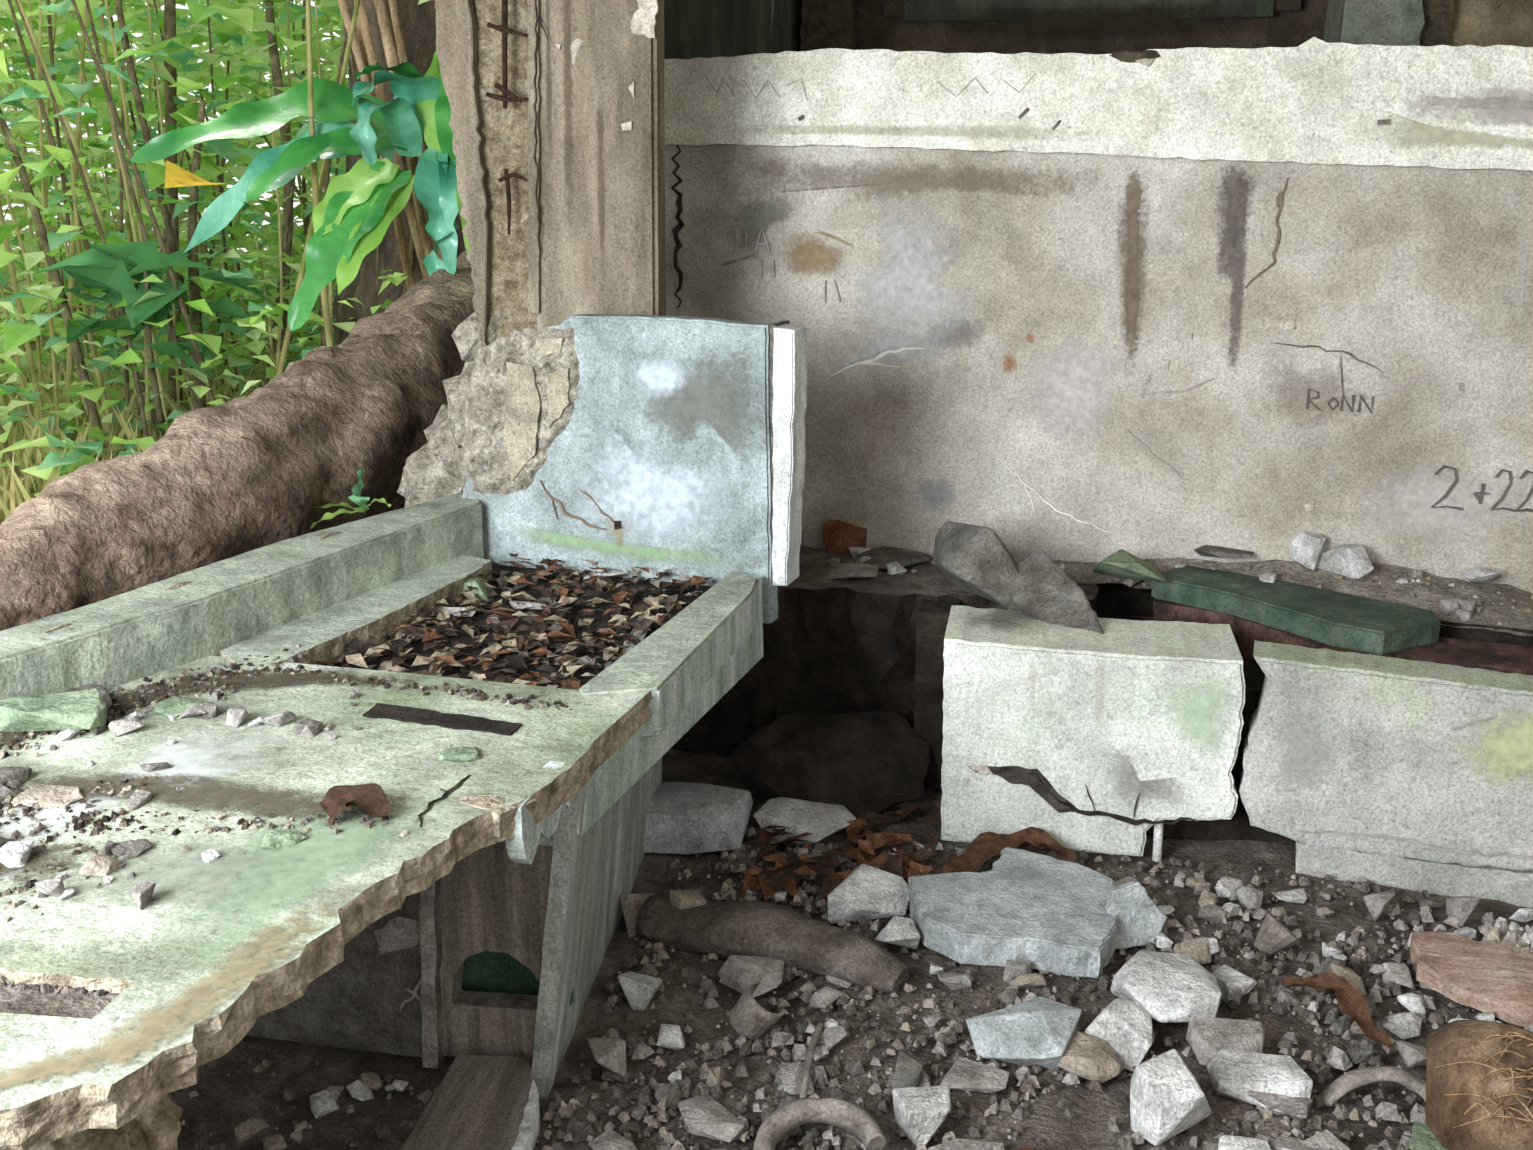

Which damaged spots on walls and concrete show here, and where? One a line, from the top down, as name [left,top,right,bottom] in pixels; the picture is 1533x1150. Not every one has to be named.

spalling [462,0,584,497]
leakage [1119,174,1147,353]
leakage [1218,167,1254,362]
crack [968,766,1199,826]